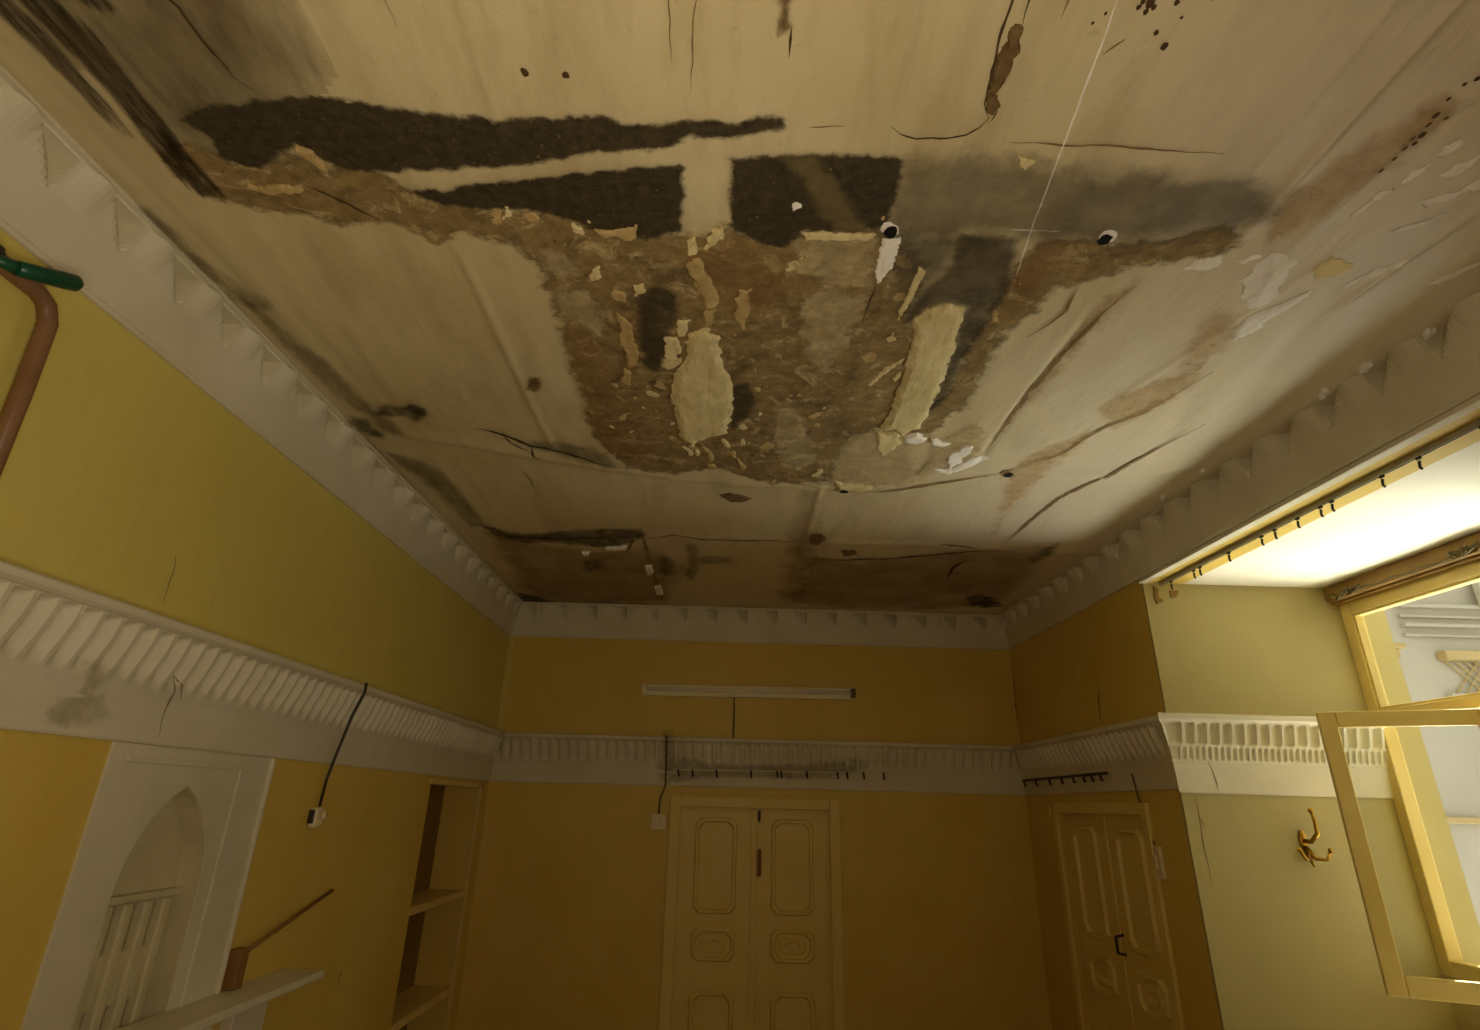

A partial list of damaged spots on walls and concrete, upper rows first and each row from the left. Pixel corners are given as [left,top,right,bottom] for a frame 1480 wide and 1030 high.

damp [1136,0,1183,19]
damp [0,0,225,198]
crack [891,0,1223,154]
damp [1378,76,1480,173]
peeling [1349,139,1480,234]
spalling [162,142,1261,493]
peeling [1230,256,1409,342]
damp [527,379,540,392]
crack [882,286,1213,492]
damp [484,527,644,547]
spalling [720,493,752,502]
crack [596,424,1205,602]